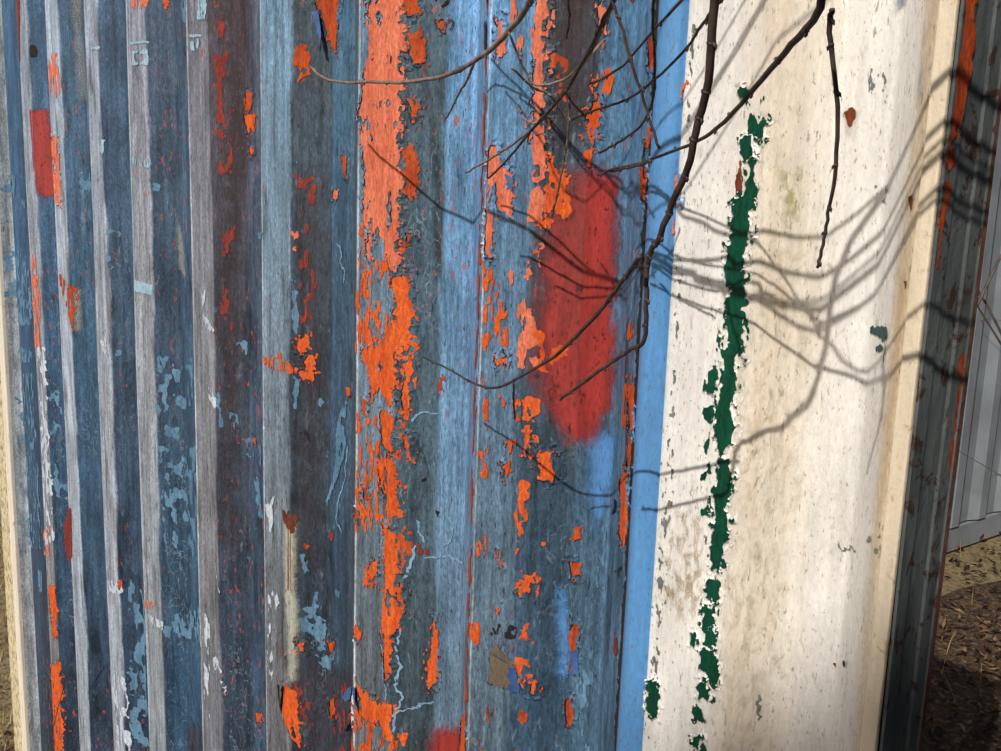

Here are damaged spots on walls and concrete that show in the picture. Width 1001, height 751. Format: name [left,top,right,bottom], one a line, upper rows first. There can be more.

peeling [577,67,614,170]
peeling [480,0,572,373]
peeling [292,0,449,751]
peeling [477,394,567,555]
peeling [616,374,636,552]
peeling [700,364,718,481]
peeling [870,326,887,352]
peeling [48,584,62,641]
peeling [50,660,68,751]
peeling [280,679,314,751]
peeling [469,569,544,646]
peeling [686,571,726,751]